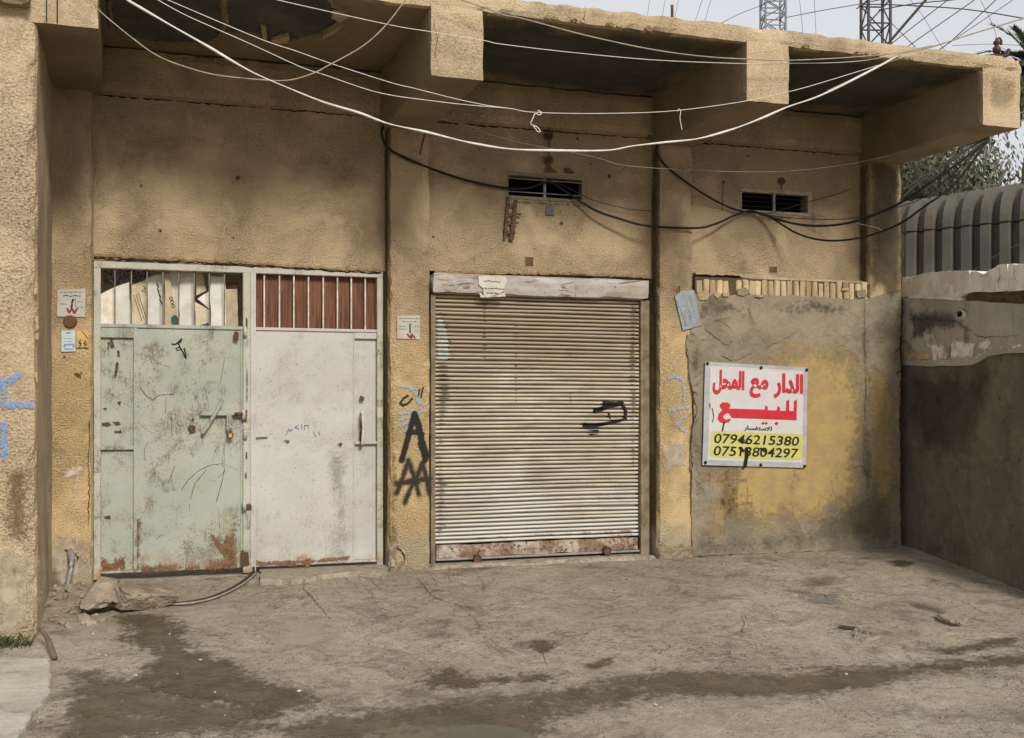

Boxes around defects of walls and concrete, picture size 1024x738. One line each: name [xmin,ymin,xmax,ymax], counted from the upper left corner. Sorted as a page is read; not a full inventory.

peeling [901,332,1021,361]
rust [101,518,350,575]
leakage [45,613,1024,738]